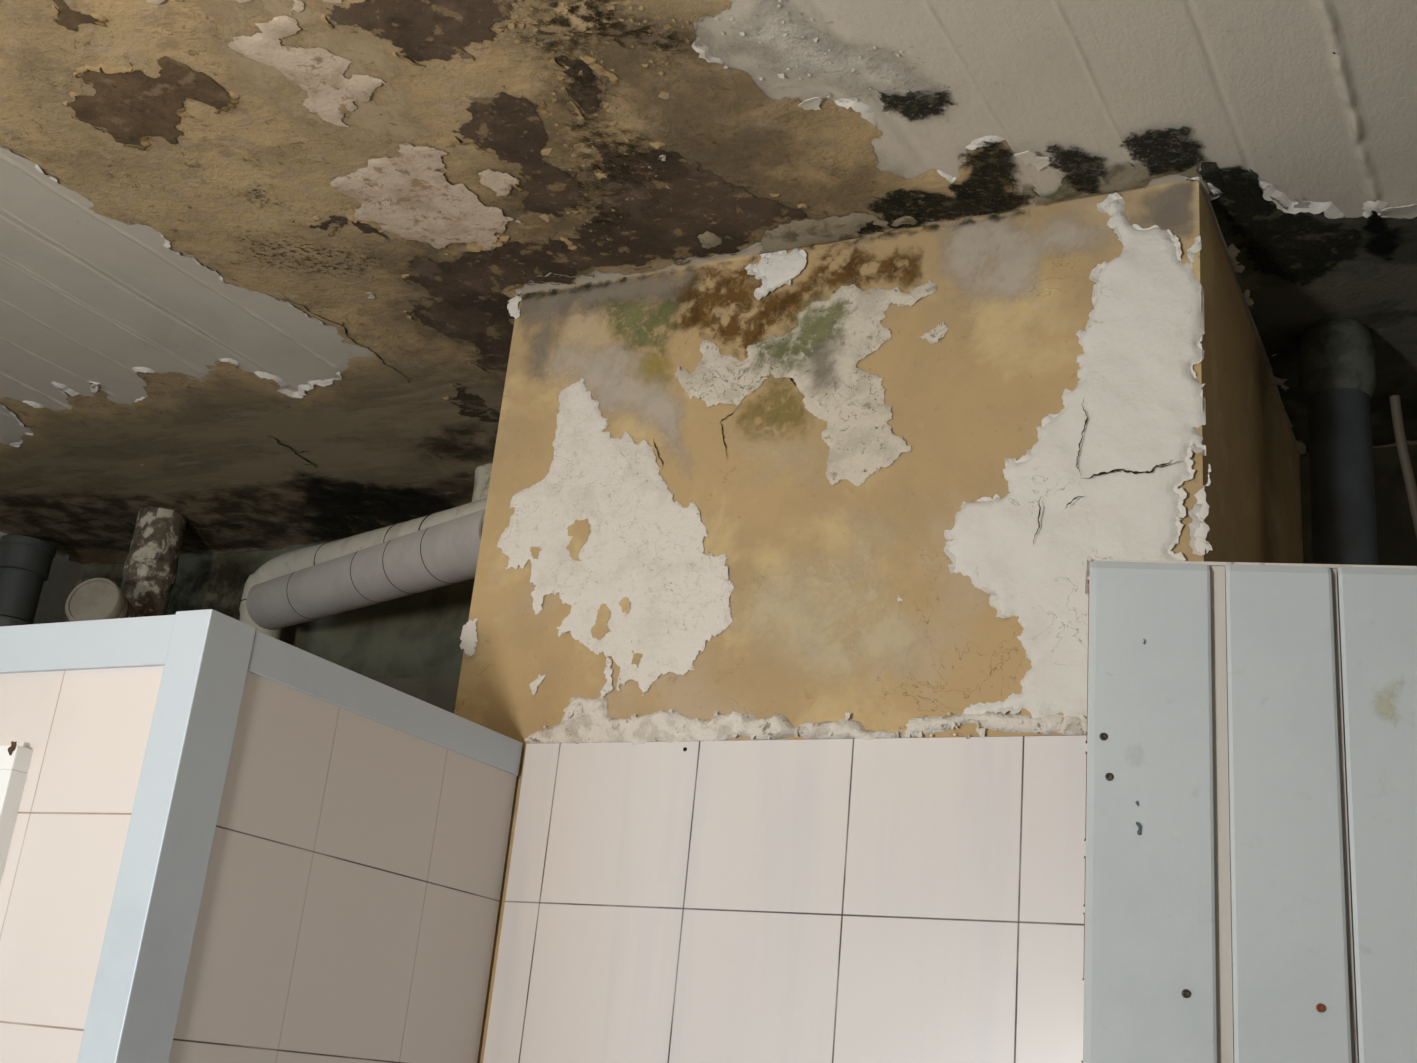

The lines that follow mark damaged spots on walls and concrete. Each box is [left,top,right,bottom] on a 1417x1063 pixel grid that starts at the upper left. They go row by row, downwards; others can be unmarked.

leakage [521,0,681,226]
leakage [879,91,953,120]
leakage [248,237,377,273]
peeling [0,0,1051,470]
leakage [855,139,1107,297]
leakage [1120,126,1401,286]
leakage [0,373,504,618]
leakage [520,273,698,451]
leakage [741,383,804,426]
leakage [759,304,844,382]
peeling [497,162,1417,745]
crack [1033,399,1181,543]